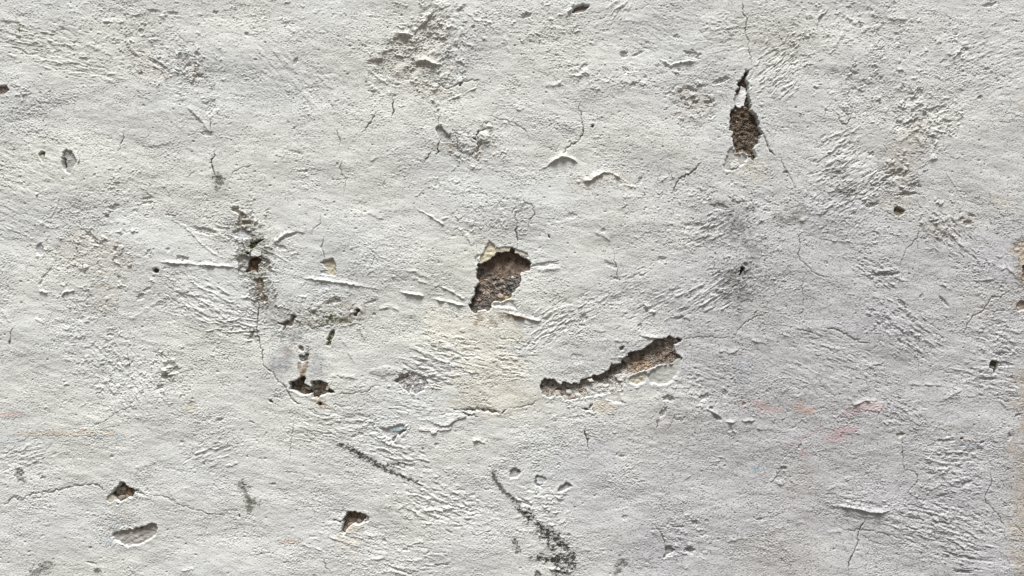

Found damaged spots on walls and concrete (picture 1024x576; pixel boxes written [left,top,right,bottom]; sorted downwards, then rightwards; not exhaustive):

spalling [724,72,761,170]
spalling [469,241,531,313]
spalling [291,376,334,397]
spalling [540,336,682,414]
spalling [108,482,144,503]
spalling [343,511,369,534]
peeling [114,523,158,546]